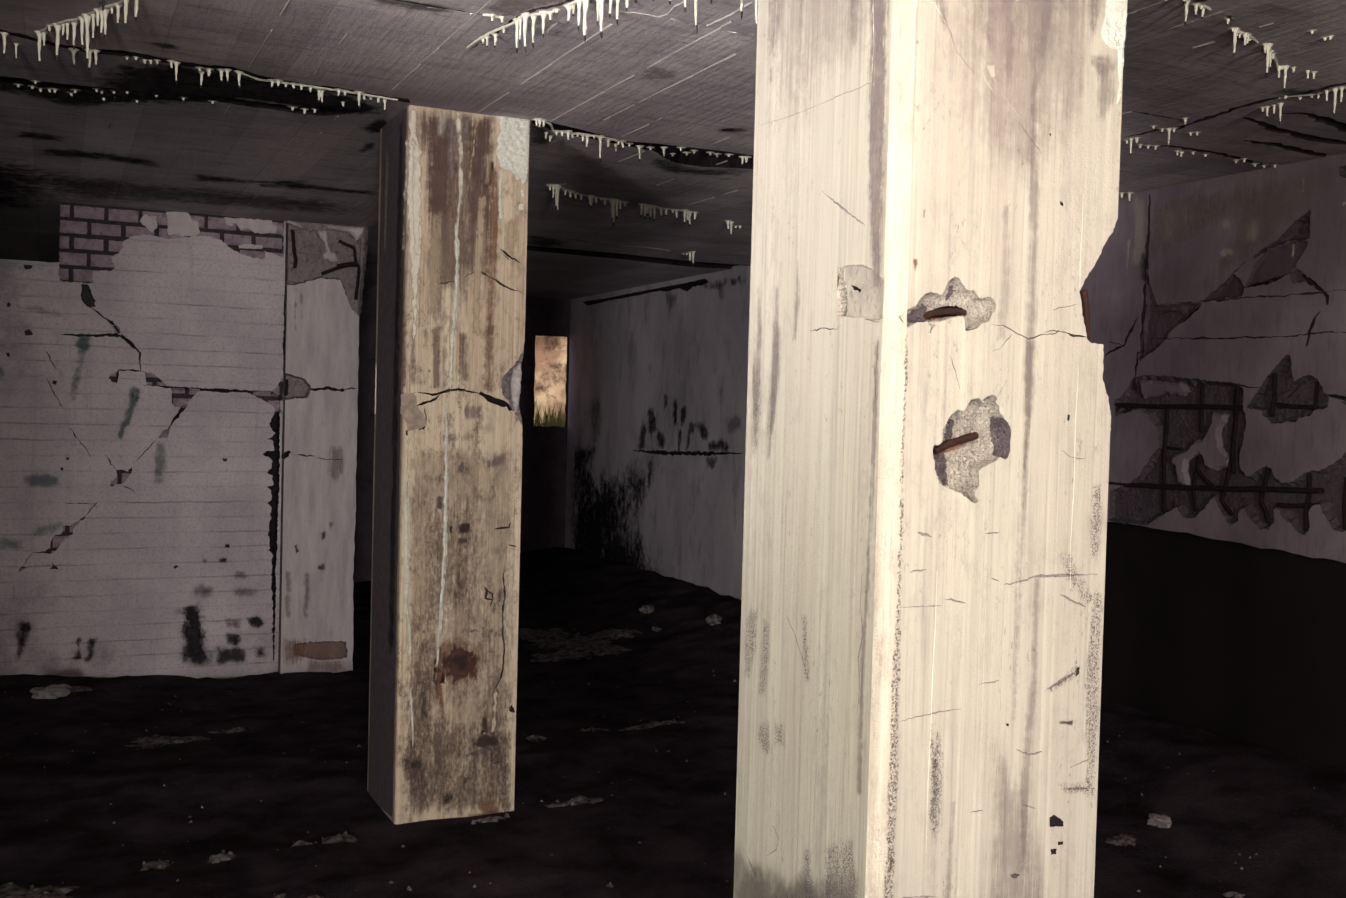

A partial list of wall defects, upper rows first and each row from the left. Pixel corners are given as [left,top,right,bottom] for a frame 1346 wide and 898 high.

water stain [467,0,576,48]
water stain [707,0,757,36]
flaking render [59,202,368,315]
spalling [1067,290,1090,341]
crack [400,388,511,426]
spalling [836,264,996,483]
spalling [1108,210,1346,535]
crack [61,284,356,661]
spalling [933,395,1011,503]
water stain [16,622,31,656]
water stain [182,606,263,665]
rust [435,645,477,721]